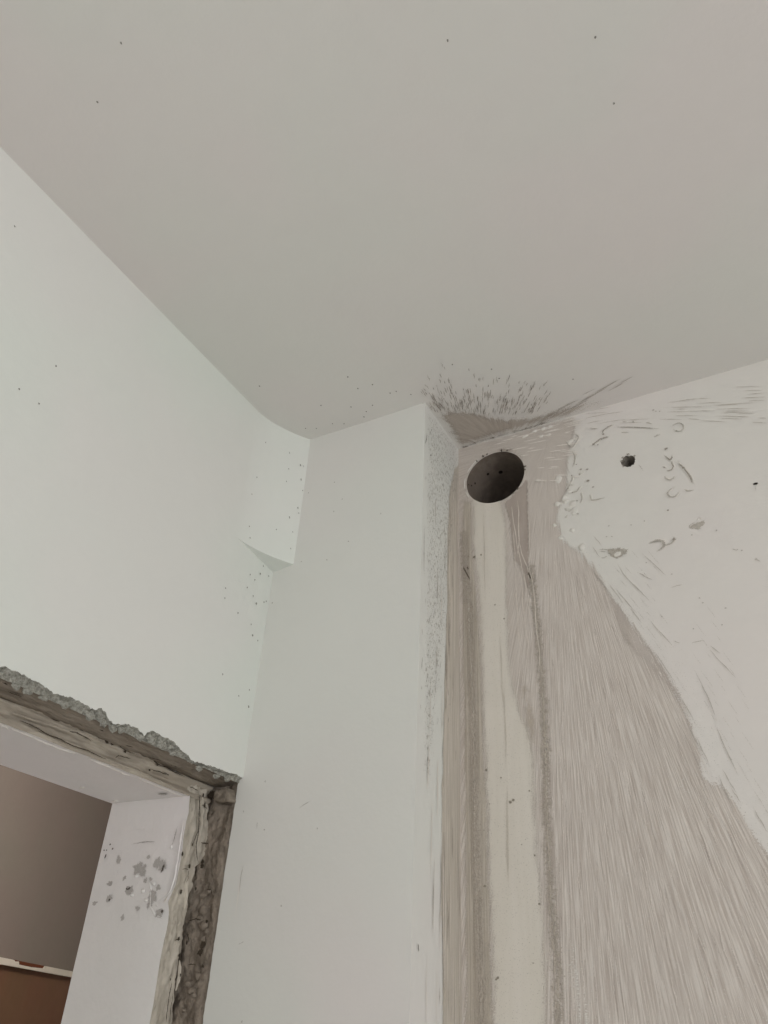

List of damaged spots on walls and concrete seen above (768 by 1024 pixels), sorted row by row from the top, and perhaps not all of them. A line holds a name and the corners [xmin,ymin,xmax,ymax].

peeling [0,666,242,1024]
water stain [420,364,631,1024]
flaking render [458,418,768,1024]